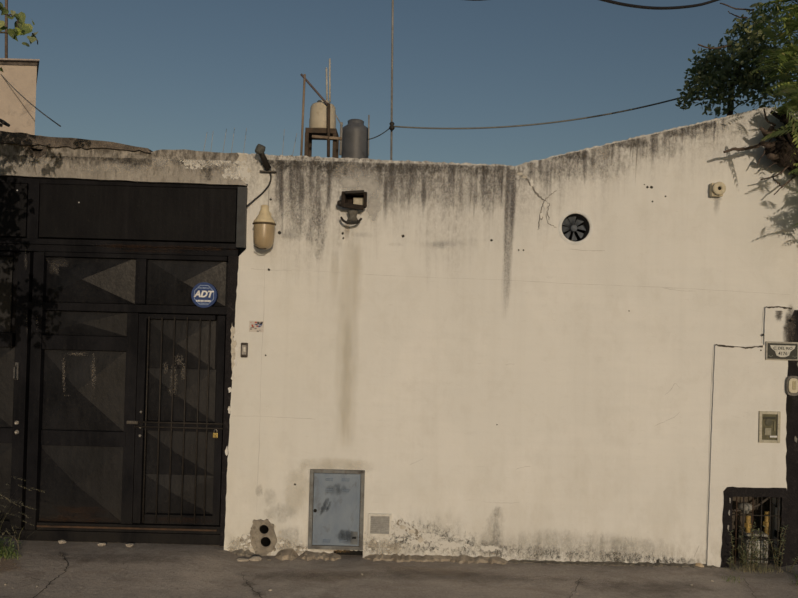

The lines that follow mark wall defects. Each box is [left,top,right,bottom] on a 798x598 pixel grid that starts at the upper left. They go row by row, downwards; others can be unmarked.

damp [262,160,358,172]
damp [446,165,515,225]
crack [517,166,557,228]